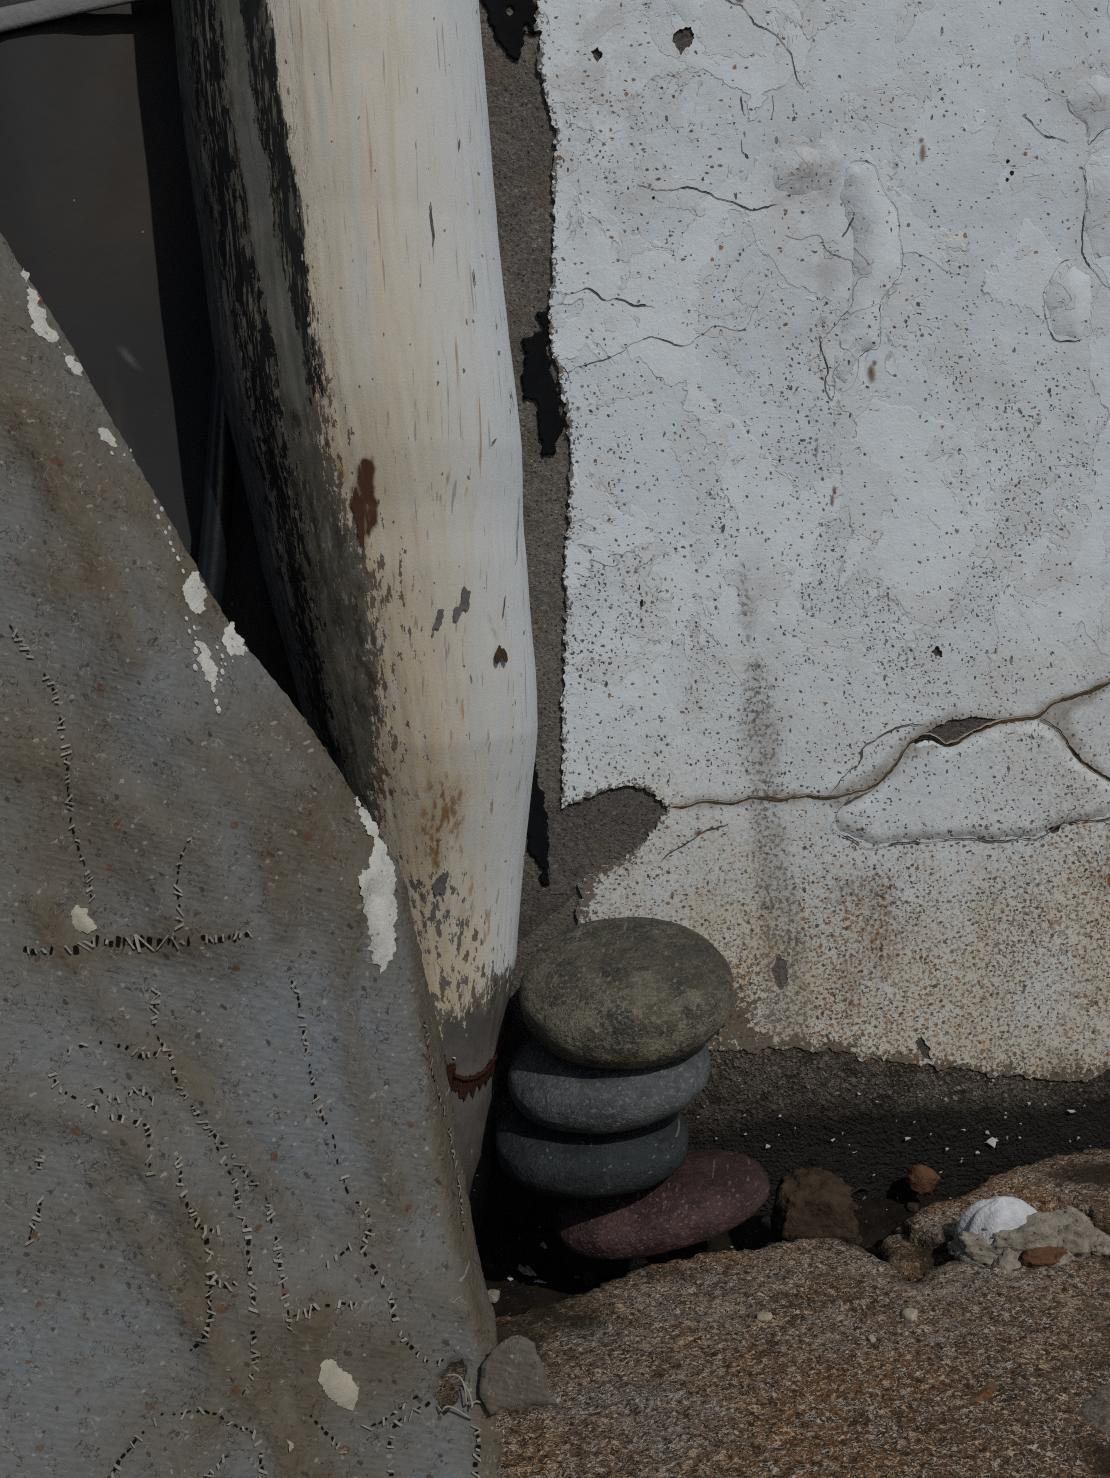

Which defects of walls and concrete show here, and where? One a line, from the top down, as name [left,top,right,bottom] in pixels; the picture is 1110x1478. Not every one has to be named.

crack [728,0,803,115]
crack [564,287,763,383]
crack [640,185,775,210]
crack [792,160,904,400]
crack [1023,100,1110,342]
peeling [479,0,668,944]
crack [663,681,1110,859]
corrosion [444,1008,513,1101]